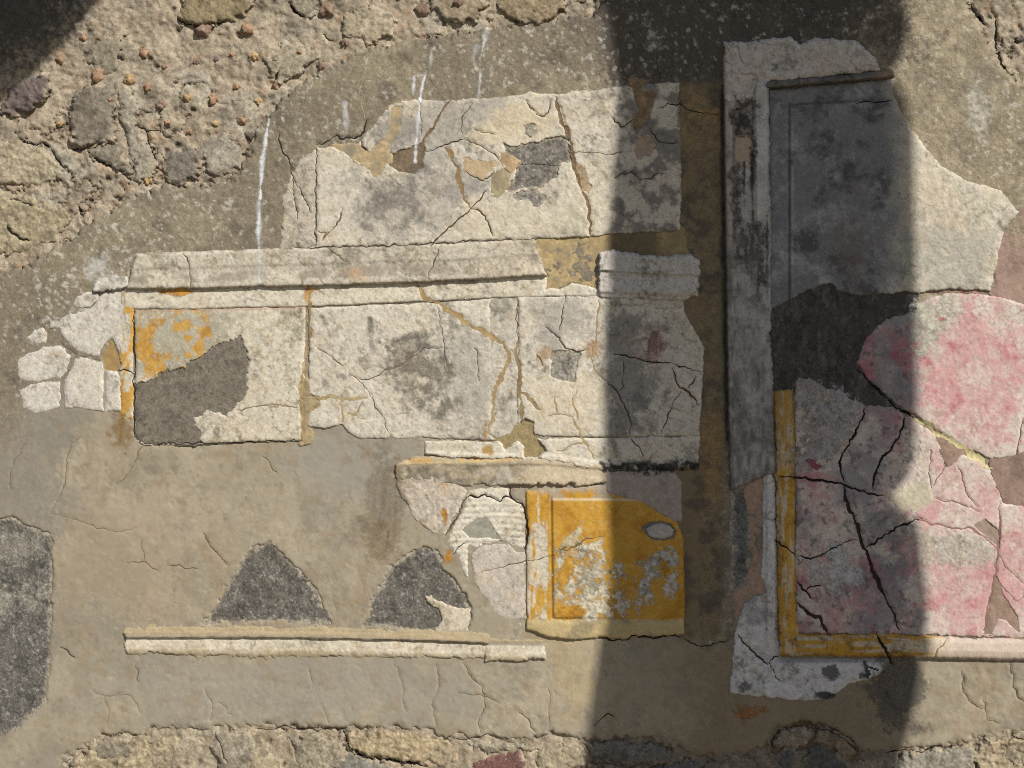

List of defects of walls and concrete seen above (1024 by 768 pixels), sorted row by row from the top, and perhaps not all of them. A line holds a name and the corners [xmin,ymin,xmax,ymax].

crack [6,226,30,241]
damp [256,119,270,289]
crack [61,73,663,482]
spalling [331,103,426,177]
damp [412,49,433,163]
spalling [463,123,593,207]
damp [728,96,769,281]
spalling [133,335,250,448]
crack [548,295,700,456]
spalling [769,283,966,473]
crack [775,370,1024,665]
spalling [0,517,53,738]